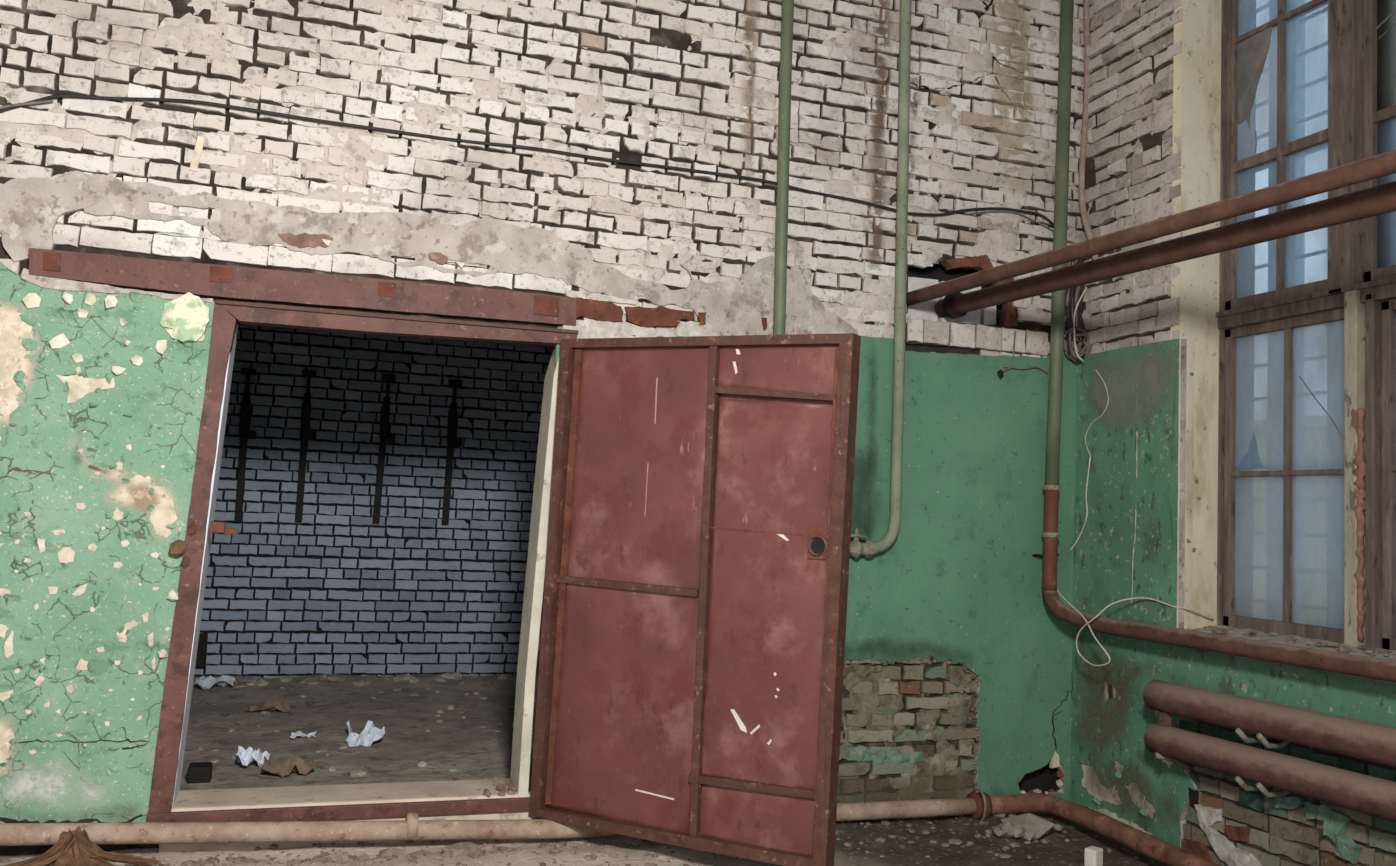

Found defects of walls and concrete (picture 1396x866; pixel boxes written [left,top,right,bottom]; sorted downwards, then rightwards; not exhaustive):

water stain [875,0,887,129]
spalling [278,233,333,248]
water stain [872,231,881,261]
corrosion [562,290,718,339]
peeling [0,292,167,453]
crack [2,465,119,483]
peeling [0,431,197,573]
peeling [0,584,96,773]
crack [15,739,149,750]
spalling [837,655,988,804]
spalling [1018,751,1064,794]
spalling [1181,788,1263,866]